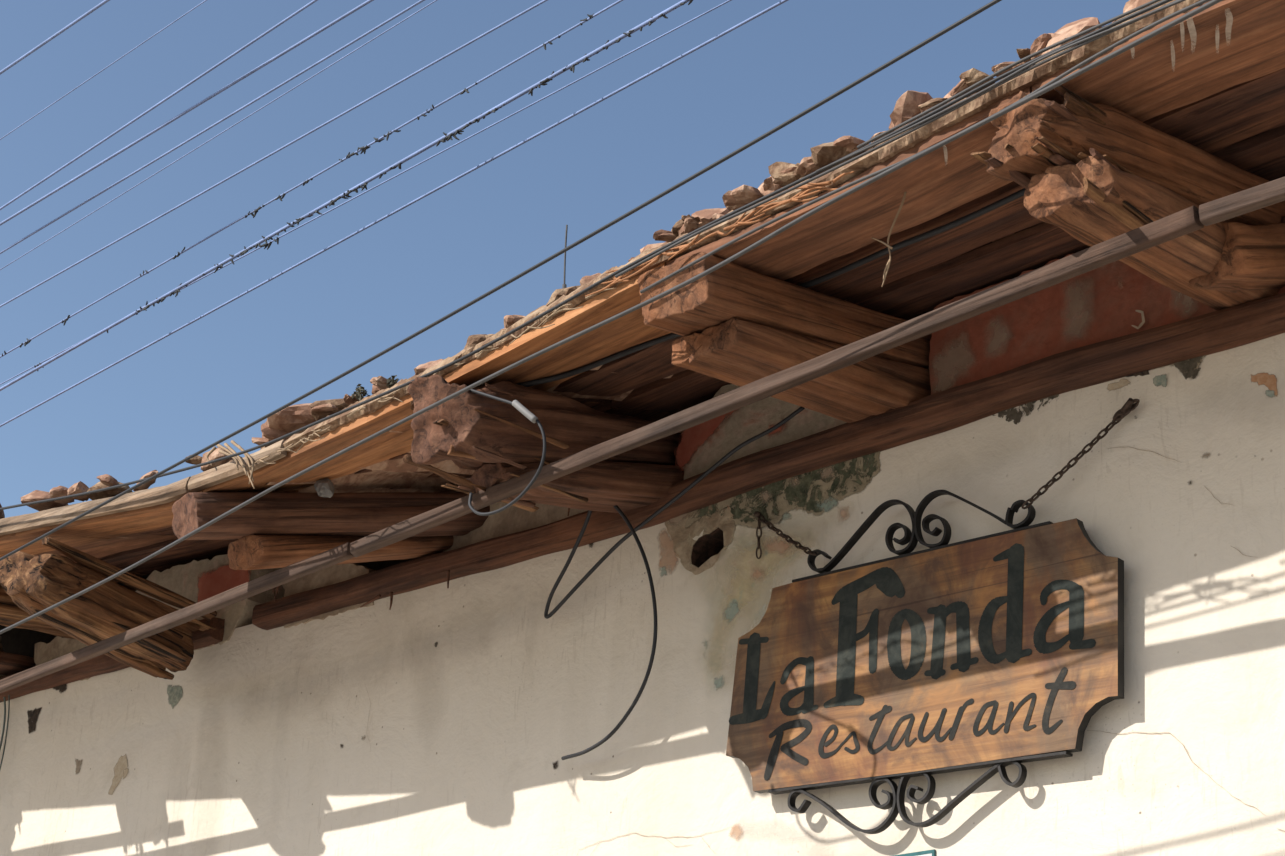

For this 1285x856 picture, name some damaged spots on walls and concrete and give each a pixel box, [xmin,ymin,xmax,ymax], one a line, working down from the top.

peeling [1251,373,1278,397]
spalling [659,451,880,643]
peeling [108,754,128,795]
crack [1087,730,1285,832]
crack [578,829,724,854]